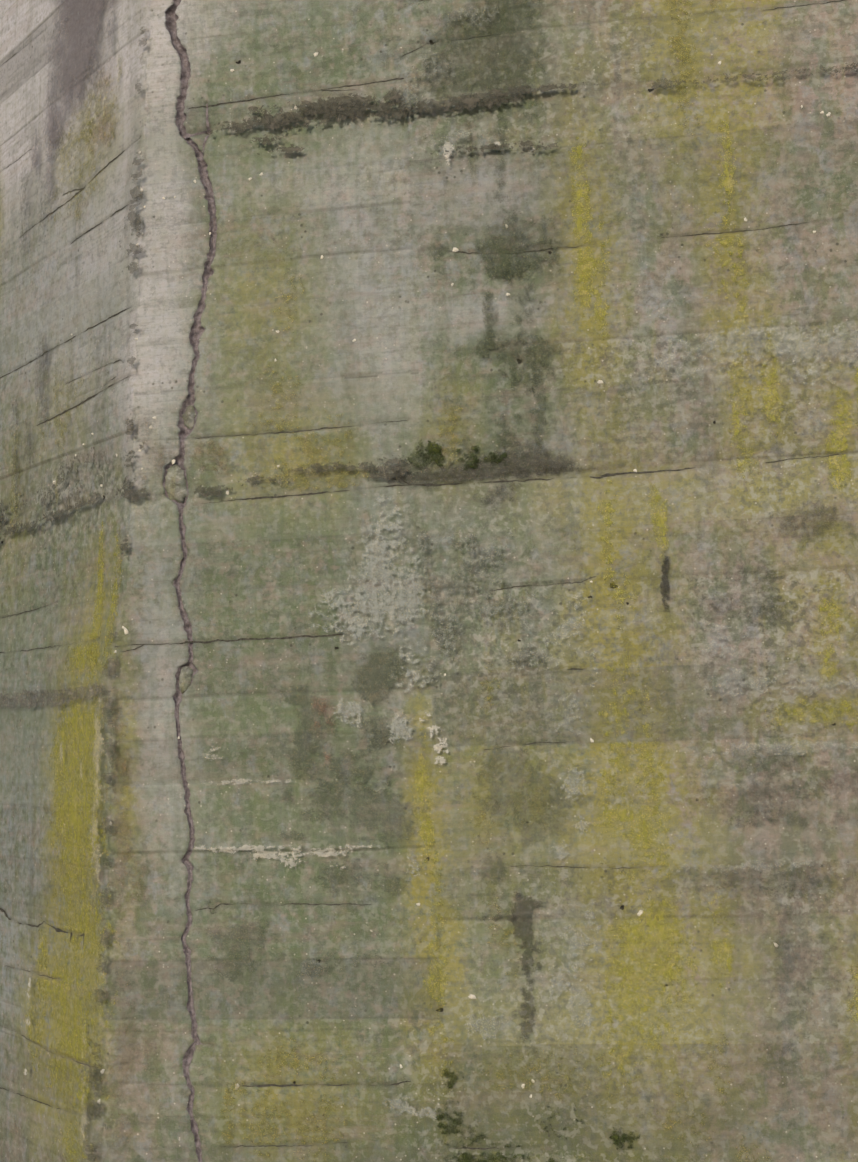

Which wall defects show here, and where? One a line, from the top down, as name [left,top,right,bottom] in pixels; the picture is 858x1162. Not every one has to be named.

leakage [31,0,113,190]
crack [22,136,141,236]
crack [0,309,127,378]
crack [37,360,136,426]
crack [114,0,697,1162]
crack [0,908,84,949]